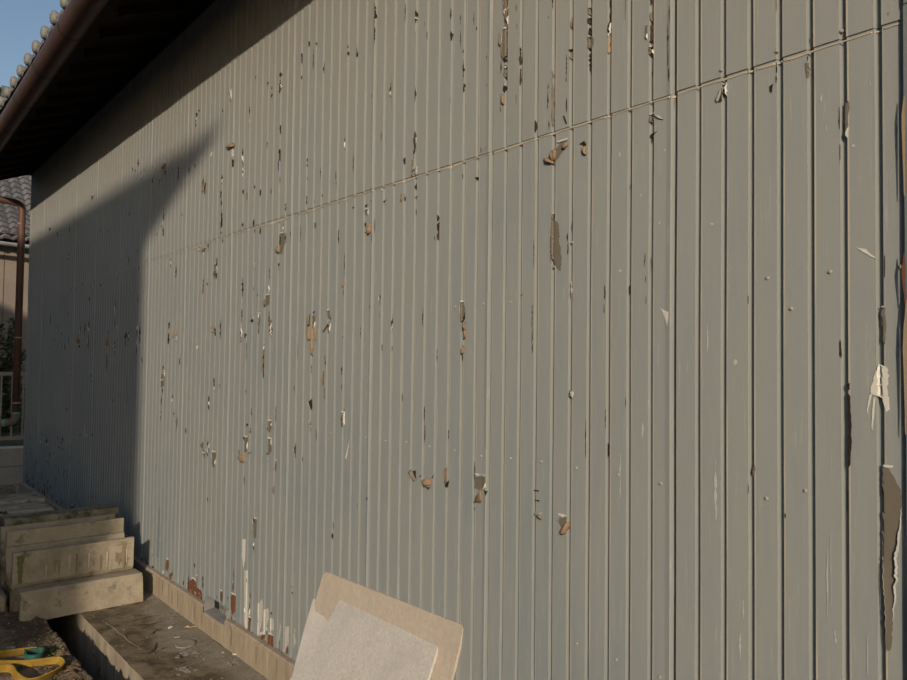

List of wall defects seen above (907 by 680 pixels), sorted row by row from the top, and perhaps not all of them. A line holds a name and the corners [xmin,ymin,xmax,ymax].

peeling [501,0,509,77]
peeling [278,226,286,271]
peeling [550,214,562,271]
peeling [474,473,486,490]
peeling [882,464,902,651]
corrosion [188,578,202,600]